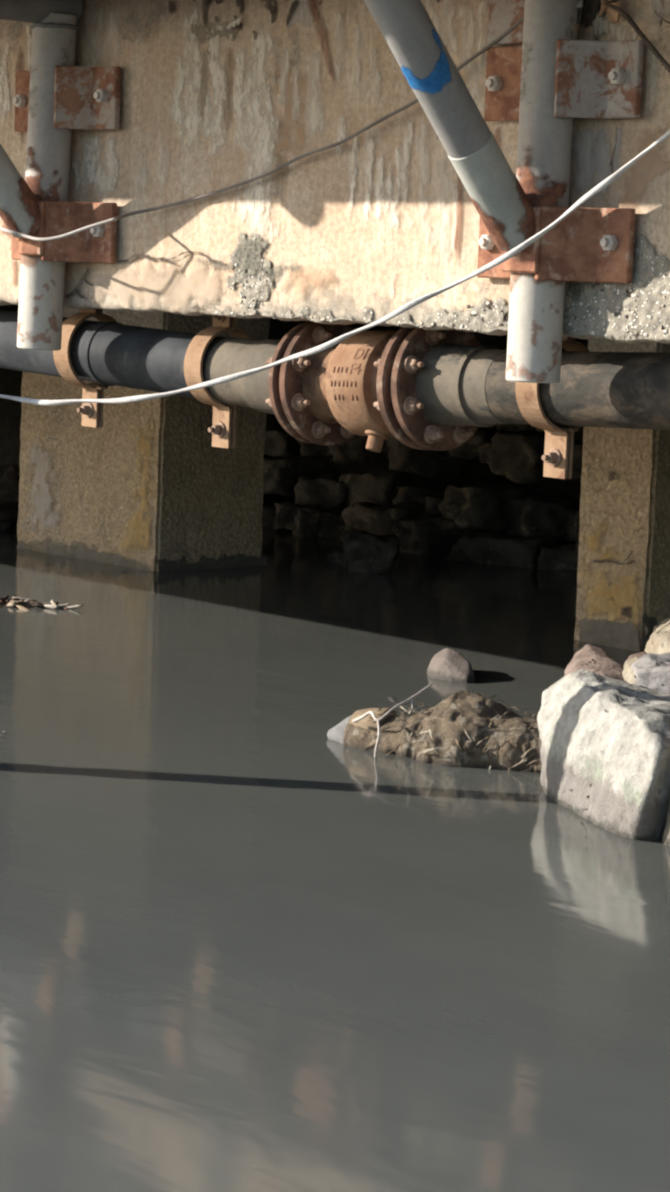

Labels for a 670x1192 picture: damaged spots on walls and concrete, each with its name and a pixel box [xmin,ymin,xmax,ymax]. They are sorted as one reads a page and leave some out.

water stain [172,7,324,237]
rust [0,132,61,286]
crack [66,269,93,299]
crack [118,251,221,264]
spalling [191,232,509,333]
water stain [337,117,458,259]
rust [455,175,510,257]
rust [514,148,567,254]
spalling [563,234,670,342]